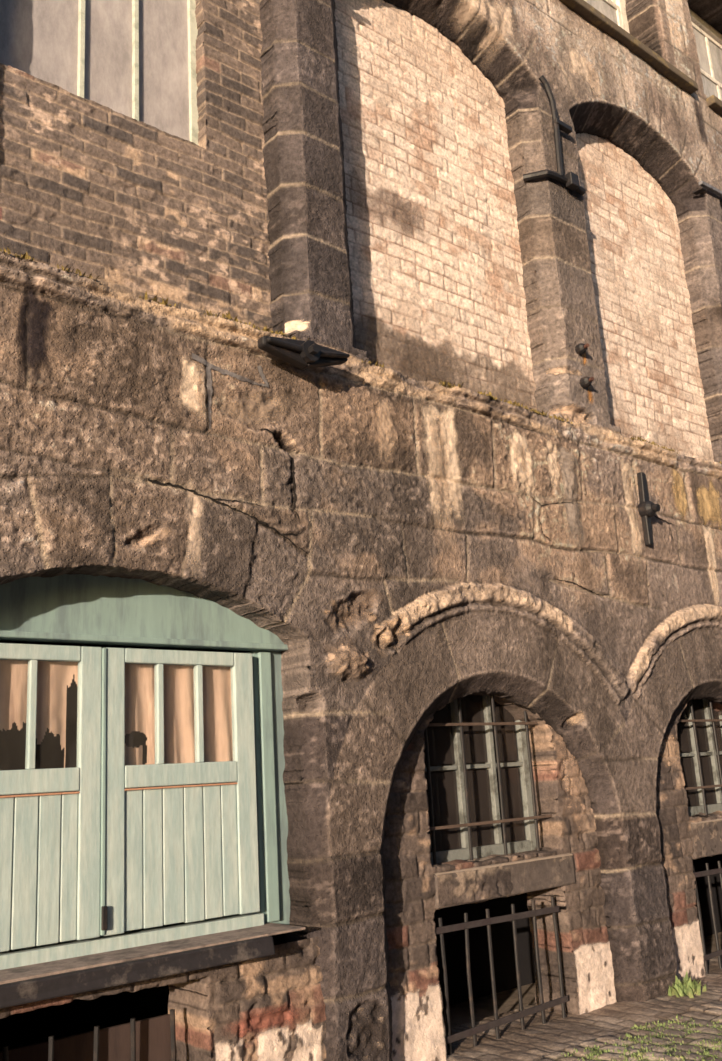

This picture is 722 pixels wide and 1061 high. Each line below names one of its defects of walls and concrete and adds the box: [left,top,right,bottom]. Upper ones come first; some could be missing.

crack [147,428,307,553]
peeling [574,942,616,1015]
peeling [215,1007,322,1061]
peeling [348,985,446,1061]